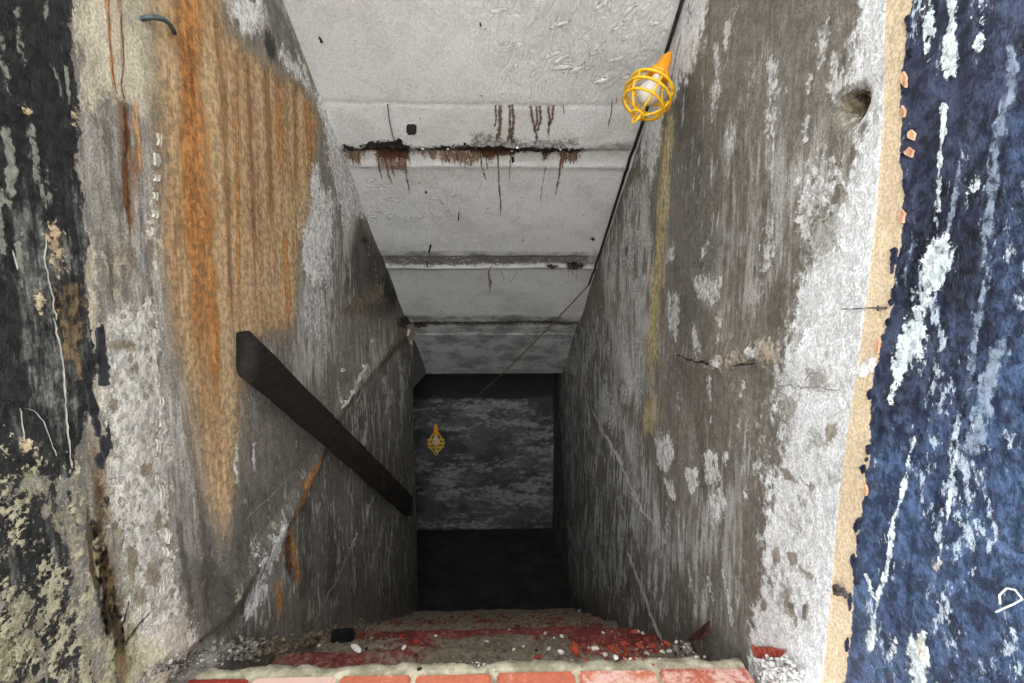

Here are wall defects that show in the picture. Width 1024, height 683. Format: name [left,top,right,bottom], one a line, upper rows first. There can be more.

peeling [0,7,27,93]
corrosion [494,105,515,142]
corrosion [529,105,565,140]
spalling [841,89,872,132]
peeling [899,0,960,117]
peeling [970,0,987,53]
peeling [0,127,25,274]
corrosion [148,0,318,529]
peeling [856,47,1020,405]
peeling [18,104,184,653]
peeling [932,280,1011,571]
corrosion [276,461,321,616]